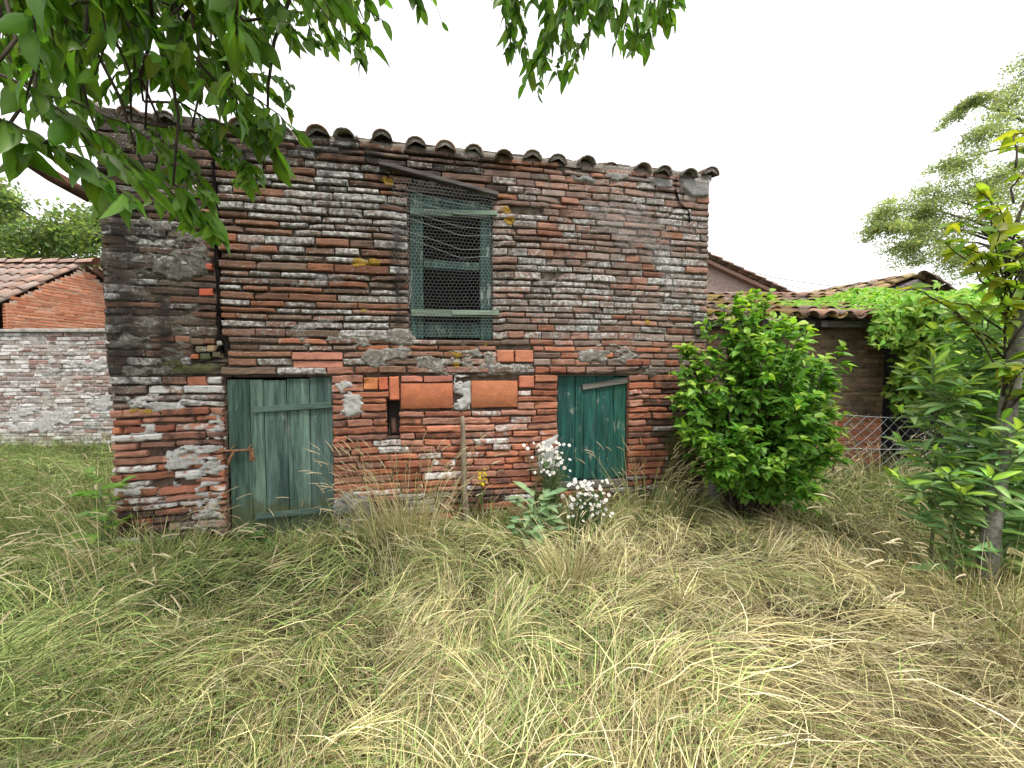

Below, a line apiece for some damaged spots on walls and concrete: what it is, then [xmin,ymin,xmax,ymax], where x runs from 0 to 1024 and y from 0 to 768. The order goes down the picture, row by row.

peeling [334,380,365,419]
peeling [164,414,228,531]